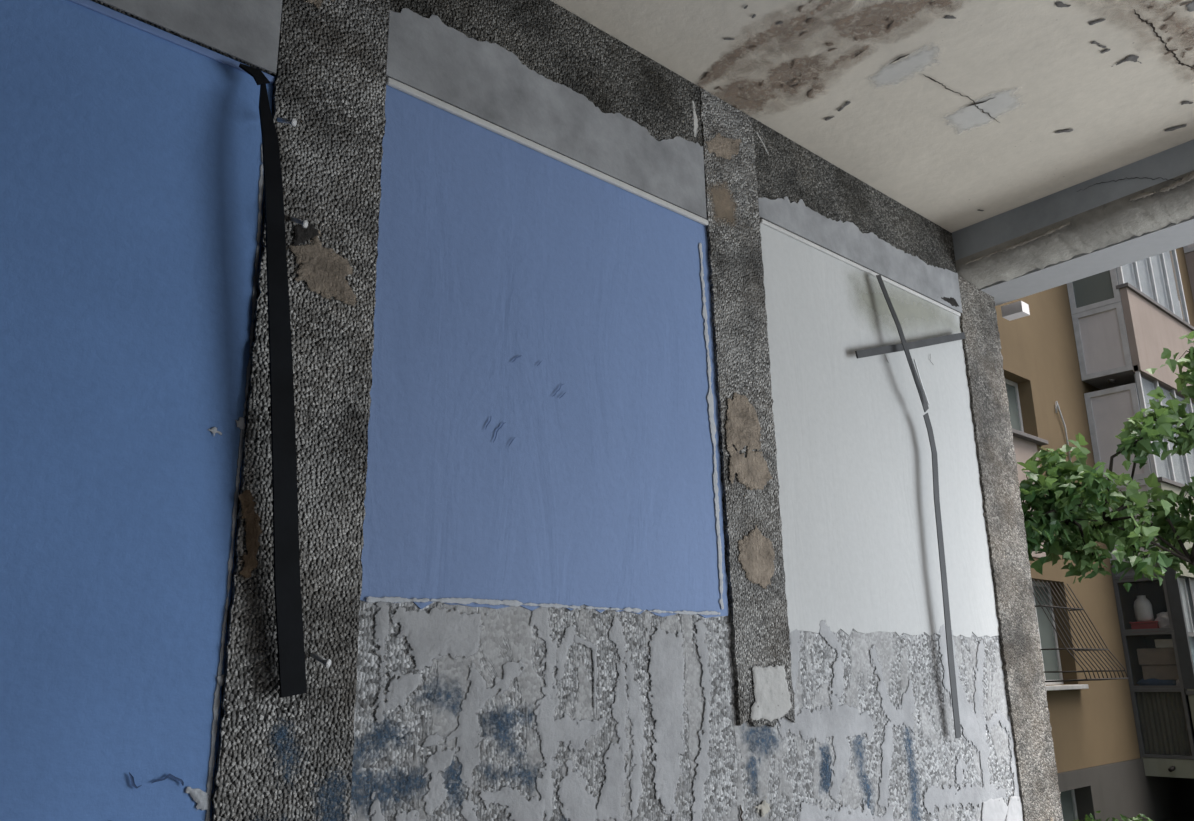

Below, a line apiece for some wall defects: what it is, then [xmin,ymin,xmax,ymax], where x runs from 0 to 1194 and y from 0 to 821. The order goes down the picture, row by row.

water stain [698,0,951,111]
crack [1134,9,1194,69]
water stain [1141,0,1194,70]
spalling [366,243,775,615]
crack [129,772,184,789]